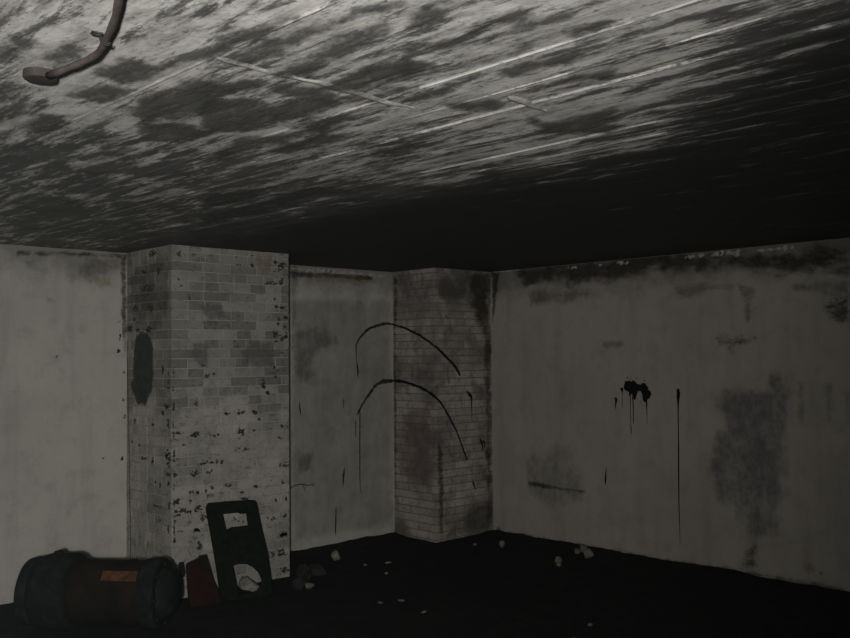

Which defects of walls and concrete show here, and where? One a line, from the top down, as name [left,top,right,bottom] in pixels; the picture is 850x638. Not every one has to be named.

damp [131,331,153,405]
damp [355,278,460,376]
damp [357,371,467,460]